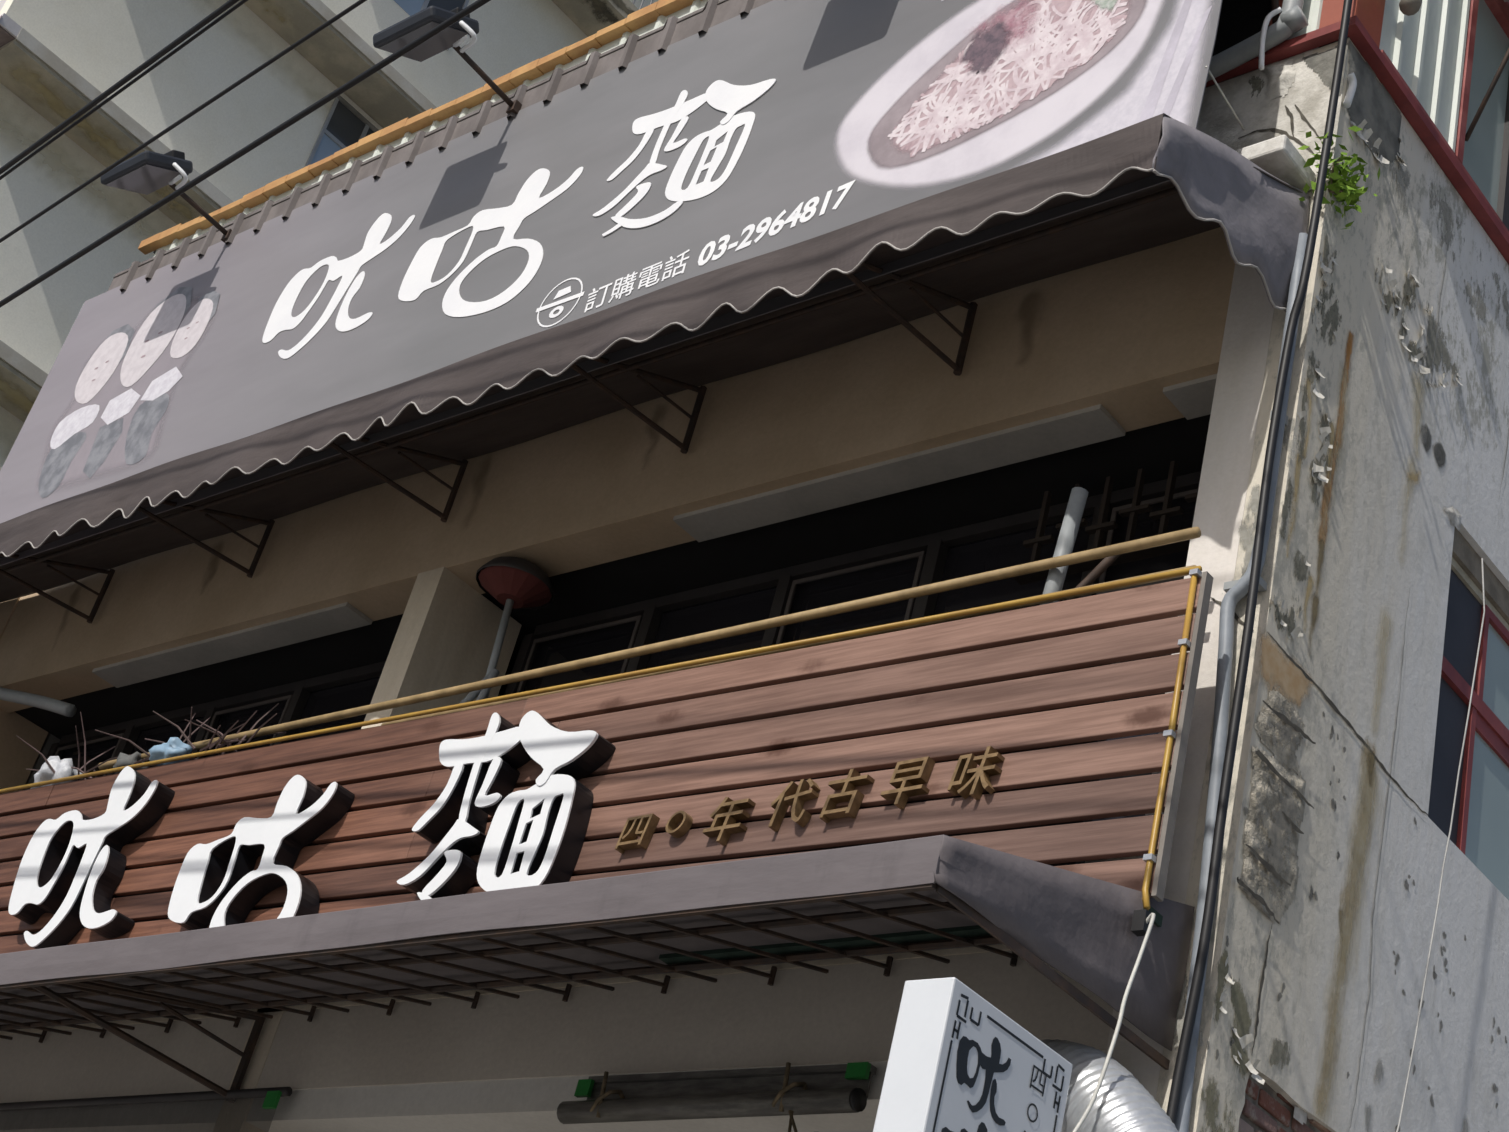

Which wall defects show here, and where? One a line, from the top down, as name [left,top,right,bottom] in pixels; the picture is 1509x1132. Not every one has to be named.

leakage [586,0,635,24]
peeling [1375,258,1424,364]
peeling [1297,234,1342,507]
leakage [1238,484,1260,576]
peeling [1279,478,1293,538]
peeling [1269,551,1311,641]
flaking render [1239,687,1318,925]
peeling [1323,712,1346,812]
crack [1210,590,1428,1128]